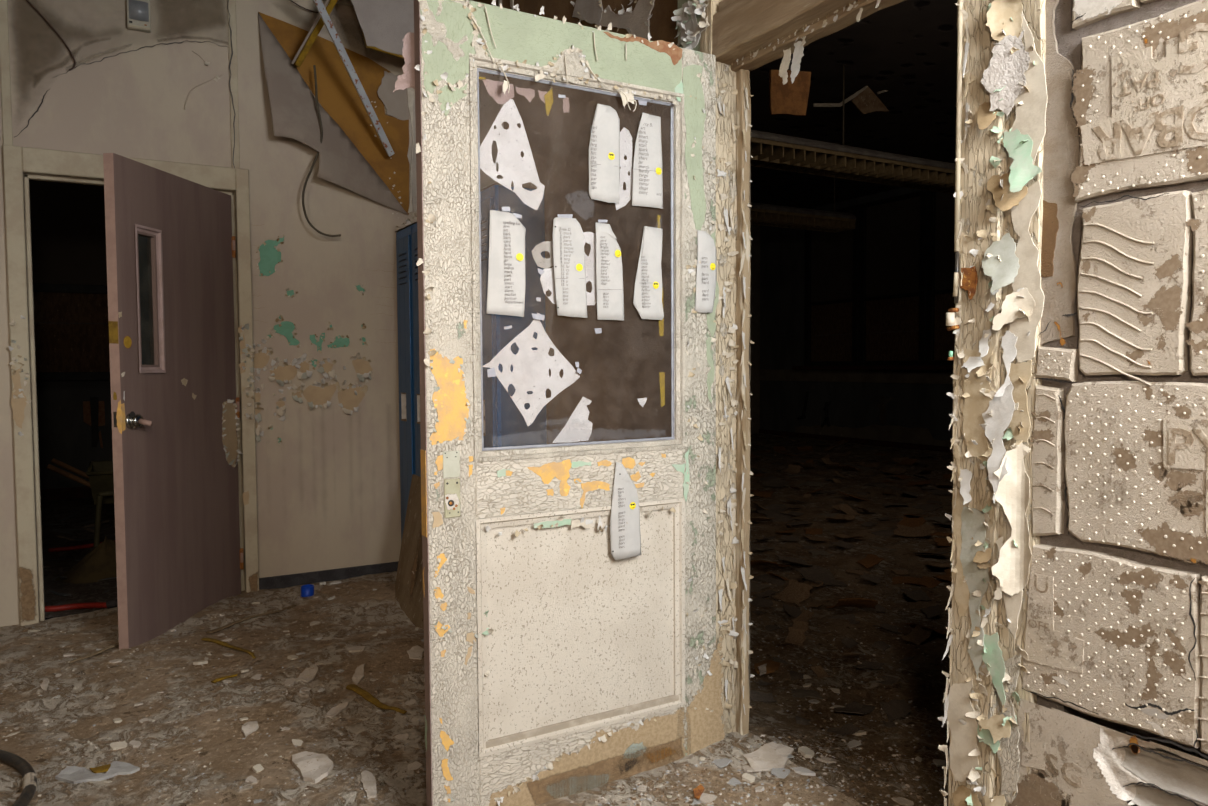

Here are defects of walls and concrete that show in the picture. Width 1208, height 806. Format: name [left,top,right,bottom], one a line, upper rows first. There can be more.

crack [15,40,227,137]
peeling [396,0,520,228]
peeling [499,45,678,108]
flaking render [534,0,710,65]
peeling [732,0,881,85]
spalling [1072,0,1123,22]
peeling [256,235,285,276]
peeling [416,258,434,300]
peeling [222,315,373,467]
peeling [424,348,471,489]
peeling [487,83,837,806]
peeling [915,0,1080,806]